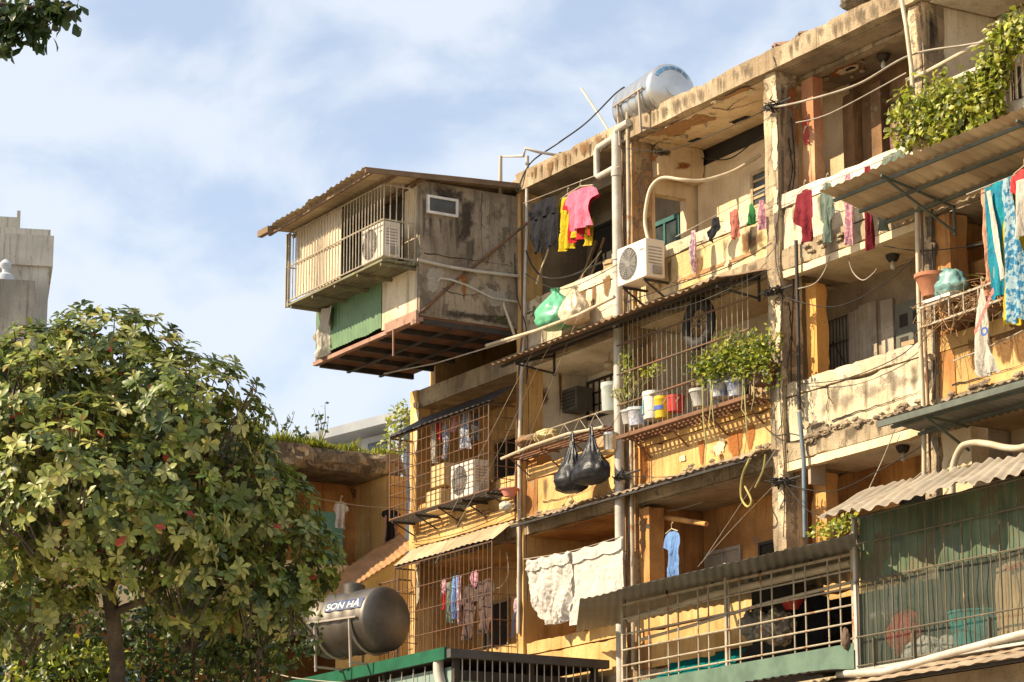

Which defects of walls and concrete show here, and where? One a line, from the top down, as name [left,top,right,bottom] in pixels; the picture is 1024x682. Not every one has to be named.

flaking render [639,83,778,145]
water stain [436,189,474,240]
water stain [449,311,505,324]
peeling [770,293,781,350]
spalling [755,353,935,509]